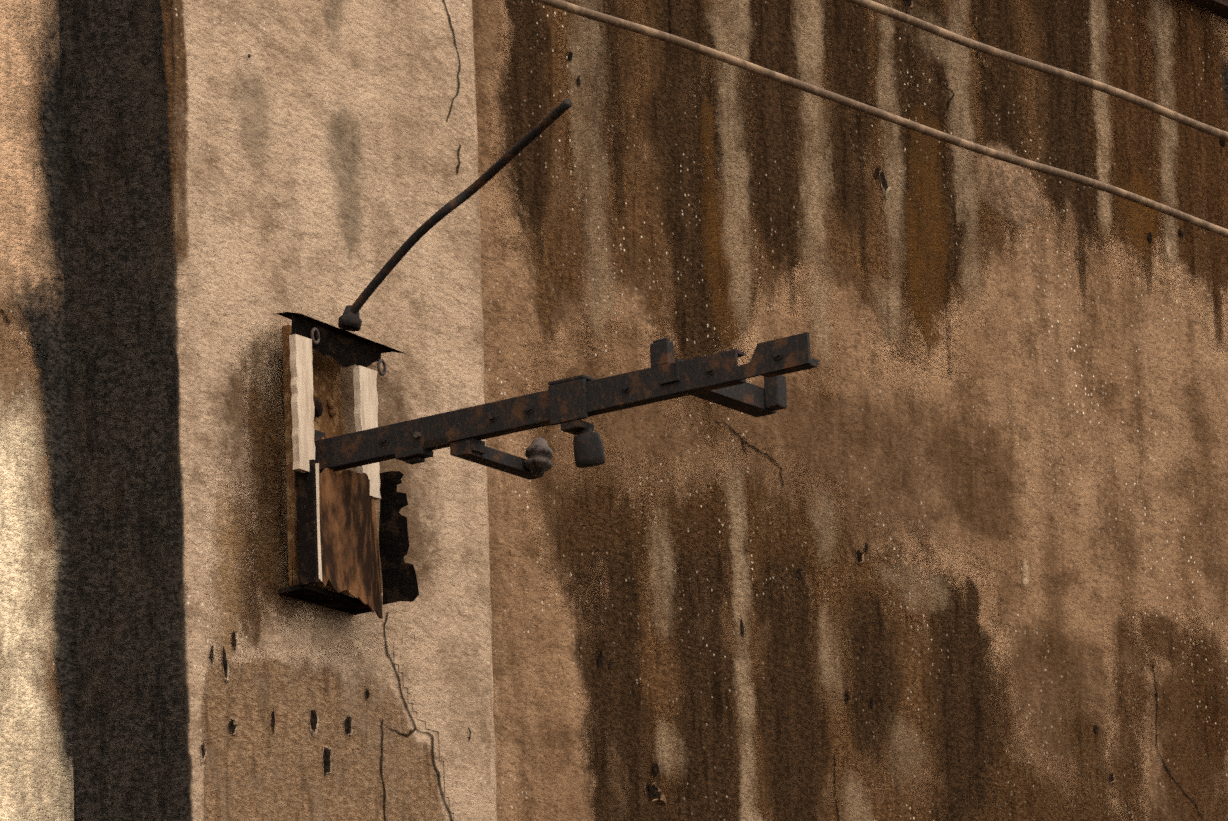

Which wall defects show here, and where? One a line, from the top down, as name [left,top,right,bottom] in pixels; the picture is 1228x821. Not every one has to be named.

crack [443,0,461,174]
damp [499,0,1228,362]
damp [0,0,193,821]
peeling [200,630,445,821]
crack [379,612,453,821]
damp [553,467,1228,821]